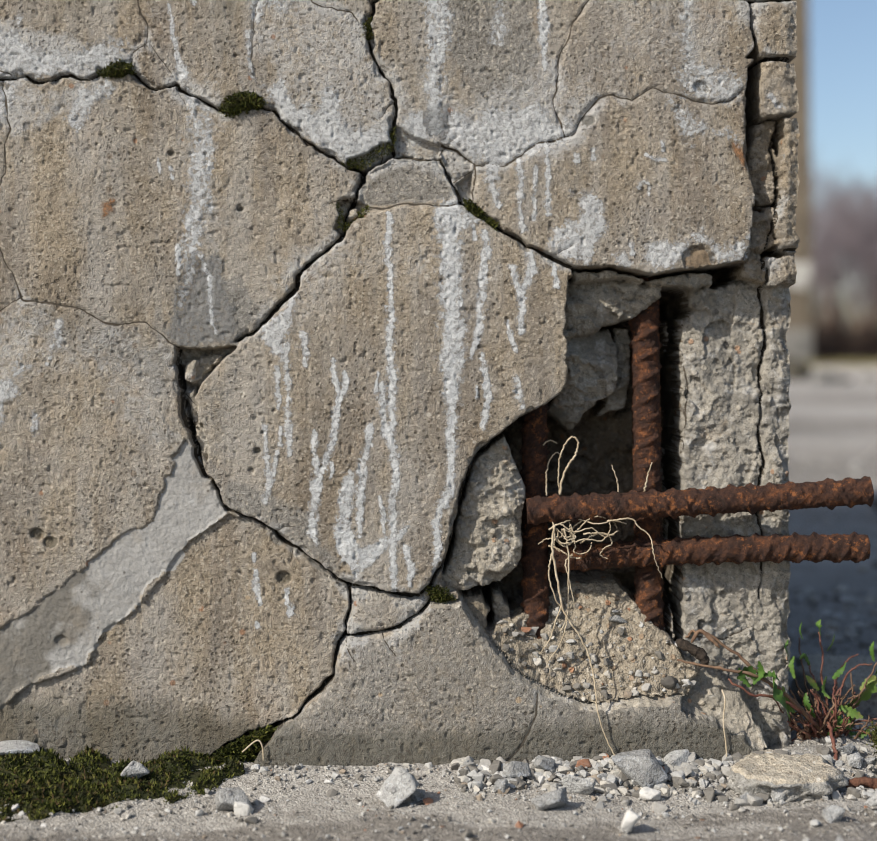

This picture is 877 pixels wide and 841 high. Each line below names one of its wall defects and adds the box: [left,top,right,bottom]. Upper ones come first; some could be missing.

crack [0,70,100,185]
crack [0,249,493,731]
leakage [258,287,311,505]
leakage [307,211,415,592]
leakage [267,0,576,233]
leakage [431,199,492,574]
spalling [441,416,526,635]
crack [238,0,791,342]
spalling [547,519,636,597]
spalling [547,2,811,496]
spalling [662,560,792,748]
crack [756,136,797,486]